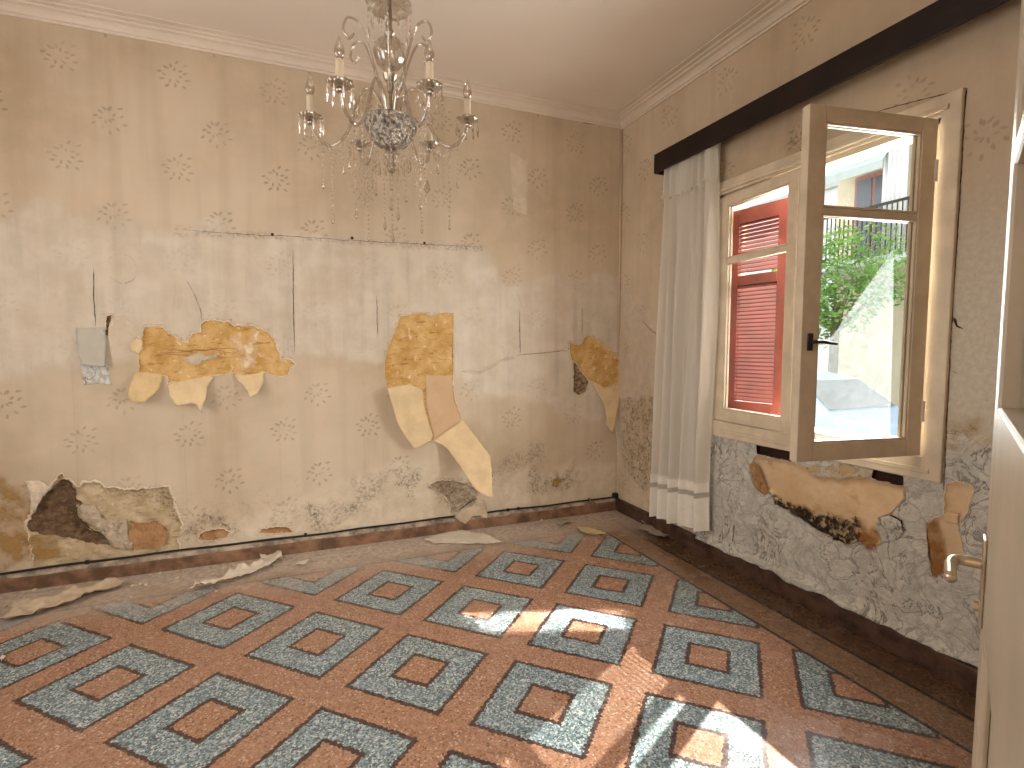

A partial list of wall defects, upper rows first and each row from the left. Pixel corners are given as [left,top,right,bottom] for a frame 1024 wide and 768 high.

crack [91,271,99,326]
crack [290,254,298,349]
leakage [0,191,658,548]
flaking render [573,363,588,395]
flaking render [25,473,184,568]
flaking render [428,479,487,524]
flaking render [749,454,906,550]